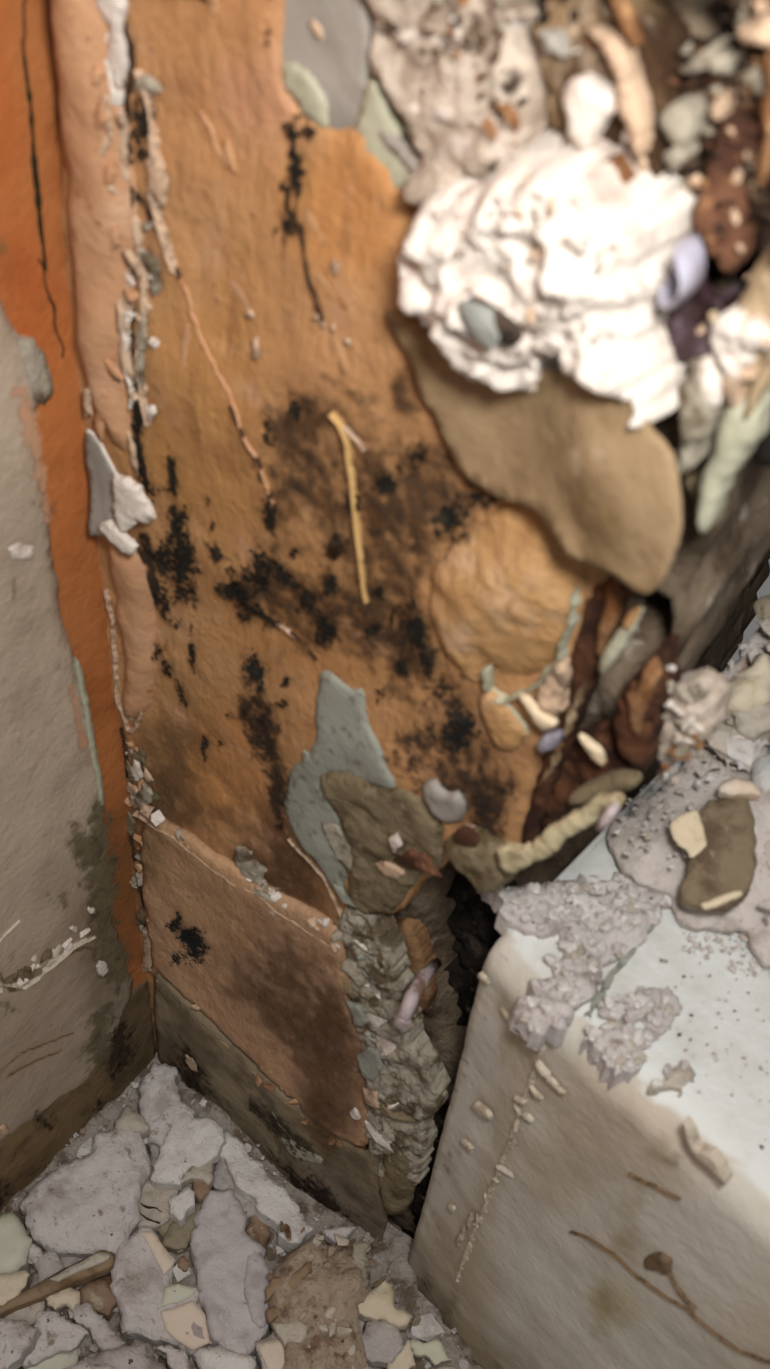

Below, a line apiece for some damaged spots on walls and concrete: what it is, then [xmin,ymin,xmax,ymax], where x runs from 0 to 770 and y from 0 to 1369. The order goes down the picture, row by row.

crack [21,0,65,358]
damp [127,94,159,165]
crack [95,0,274,508]
crack [298,222,351,346]
damp [391,375,416,412]
flaking render [281,0,551,191]
peeling [0,300,134,1141]
damp [226,647,322,903]
damp [127,385,516,838]
peeling [185,1054,198,1072]
peeling [251,1070,348,1165]
flaking render [284,670,696,1240]